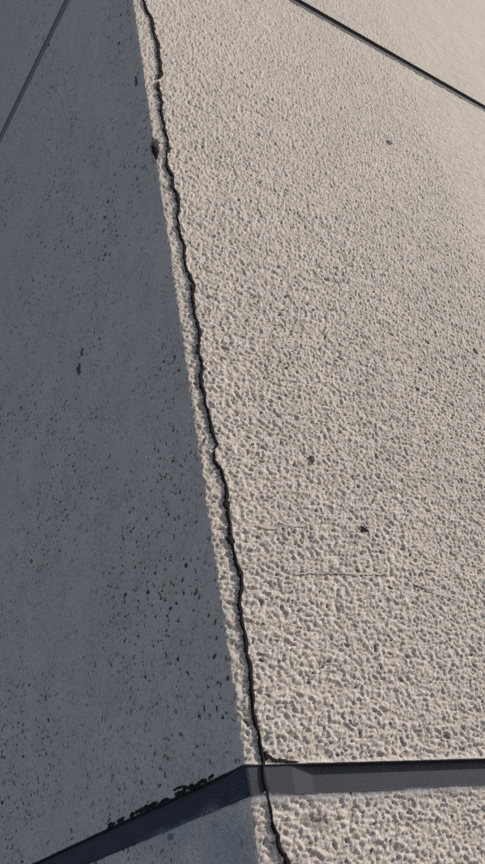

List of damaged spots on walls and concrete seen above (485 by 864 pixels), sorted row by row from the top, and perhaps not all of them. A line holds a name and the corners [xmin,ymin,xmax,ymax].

crack [143,0,291,864]